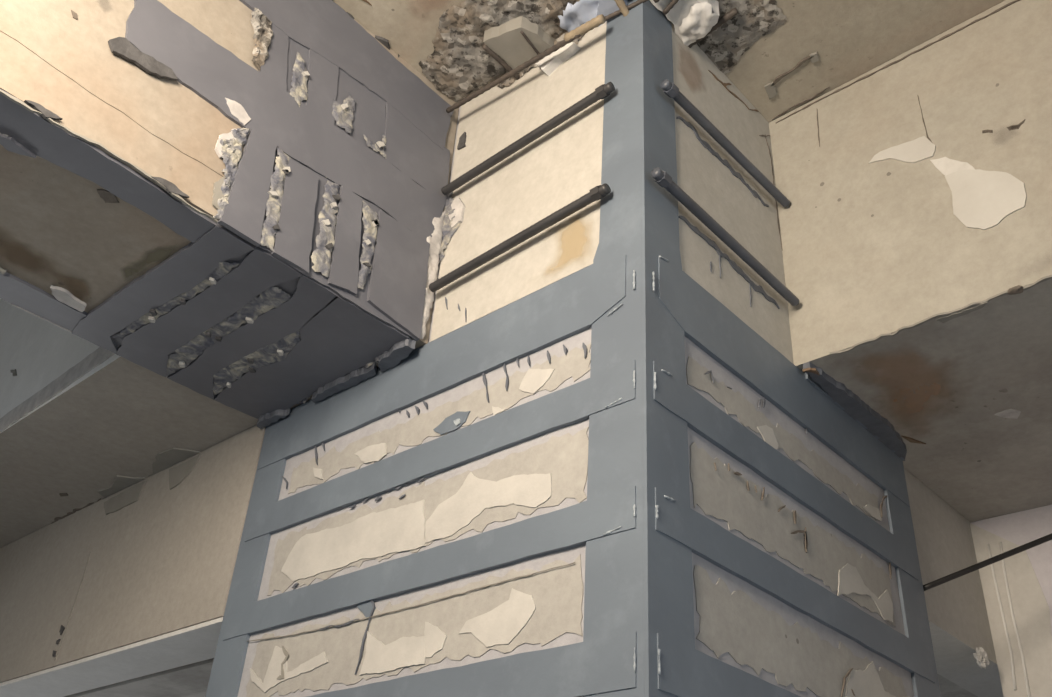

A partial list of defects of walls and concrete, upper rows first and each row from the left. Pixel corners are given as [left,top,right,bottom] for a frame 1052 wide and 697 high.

spalling [250,8,273,72]
spalling [419,0,787,113]
peeling [930,157,1027,230]
water stain [0,237,88,298]